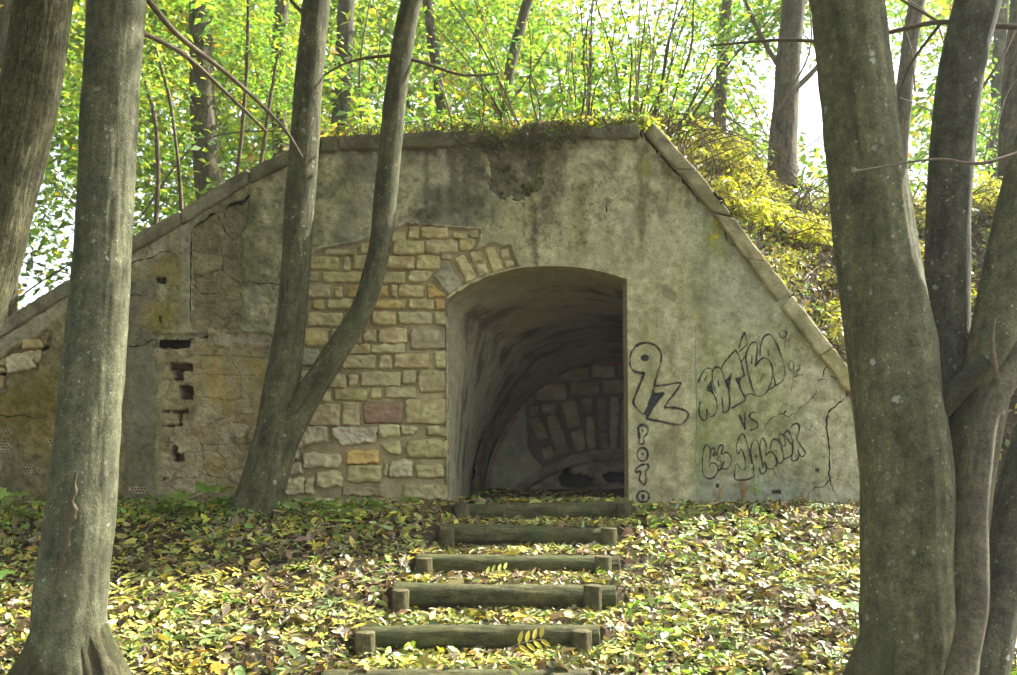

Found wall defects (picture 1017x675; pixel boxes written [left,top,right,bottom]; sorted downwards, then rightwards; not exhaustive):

spalling [0,332,52,393]
spalling [129,316,272,504]
flaking render [284,221,528,508]
crack [763,367,848,499]